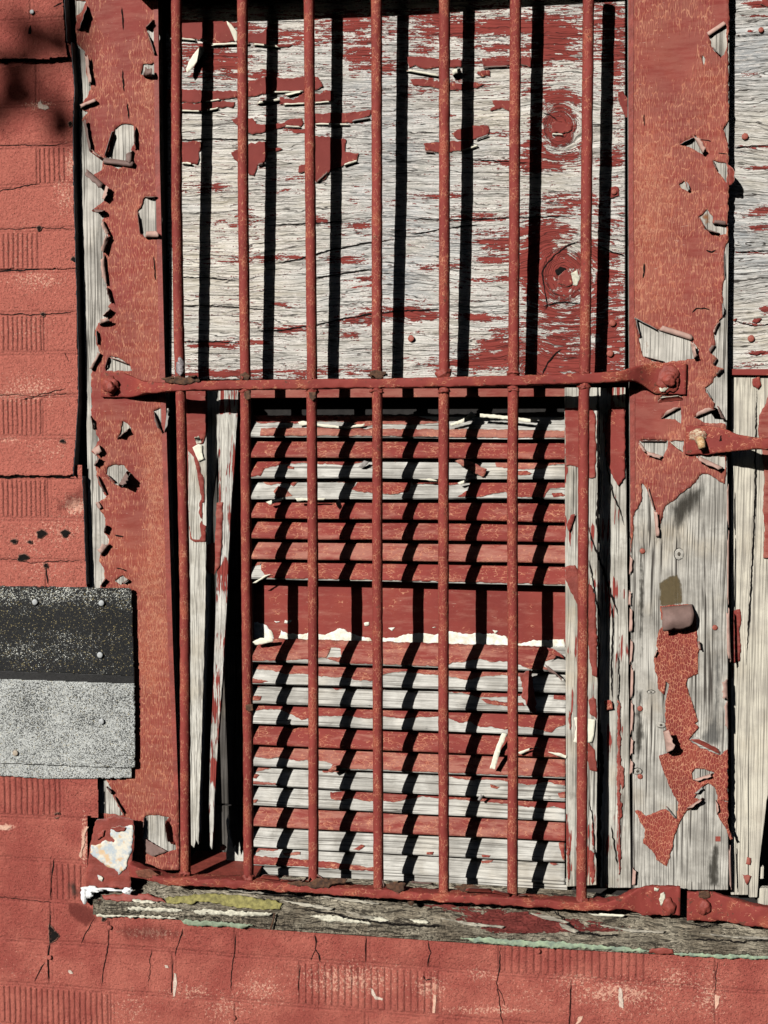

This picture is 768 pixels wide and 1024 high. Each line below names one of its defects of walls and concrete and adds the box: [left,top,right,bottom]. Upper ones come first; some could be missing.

peeling [77,44,136,587]
corrosion [161,357,200,385]
corrosion [368,370,388,379]
peeling [251,458,565,509]
peeling [628,455,733,890]
peeling [253,620,595,820]
corrosion [260,874,348,889]
corrosion [382,879,434,893]
peeling [254,826,564,884]
corrosion [455,884,528,897]
crack [81,919,110,982]
crack [496,949,505,1022]